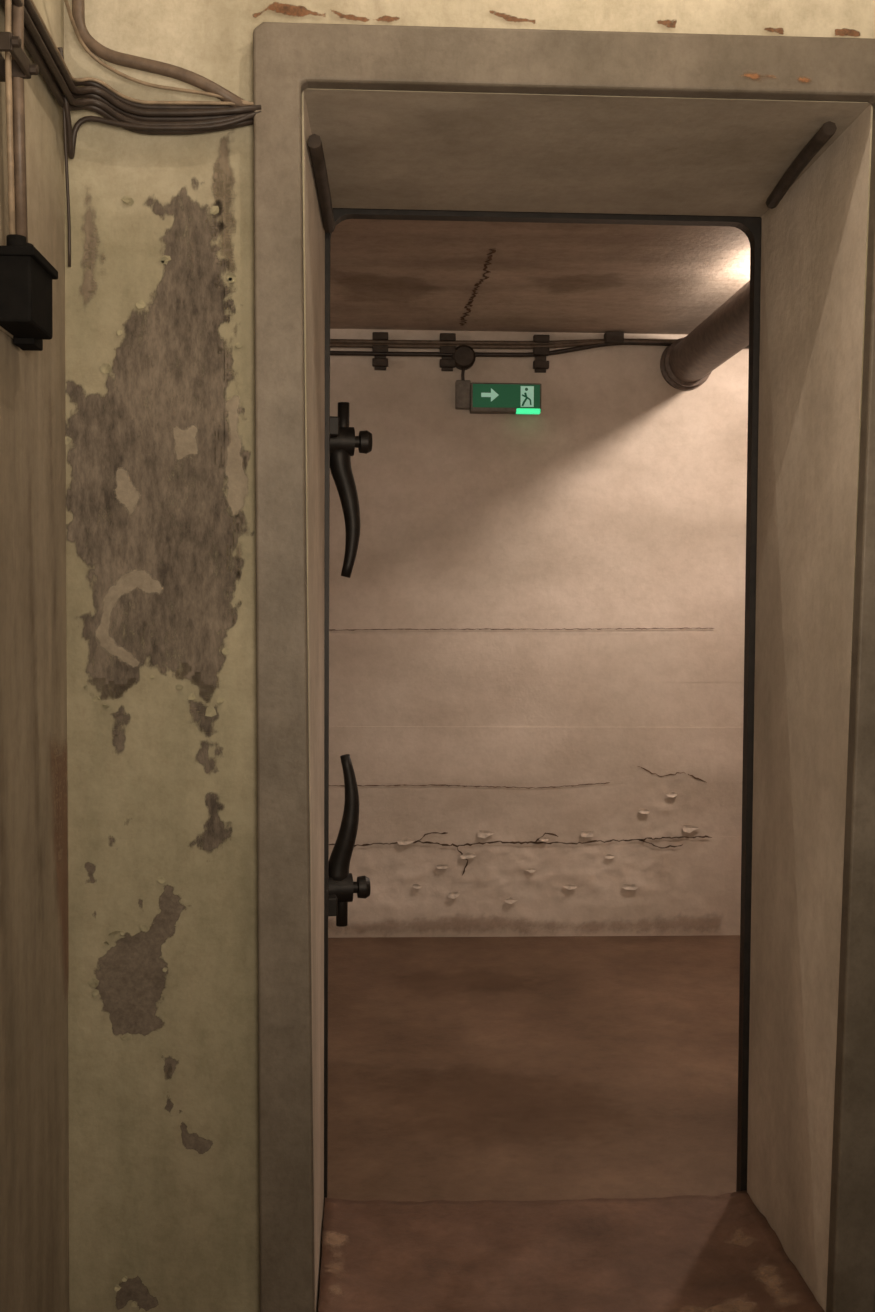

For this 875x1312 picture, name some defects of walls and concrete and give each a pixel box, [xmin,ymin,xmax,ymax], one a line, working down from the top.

peeling [65,138,253,773]
peeling [85,862,96,883]
peeling [190,793,232,852]
peeling [87,876,186,1041]